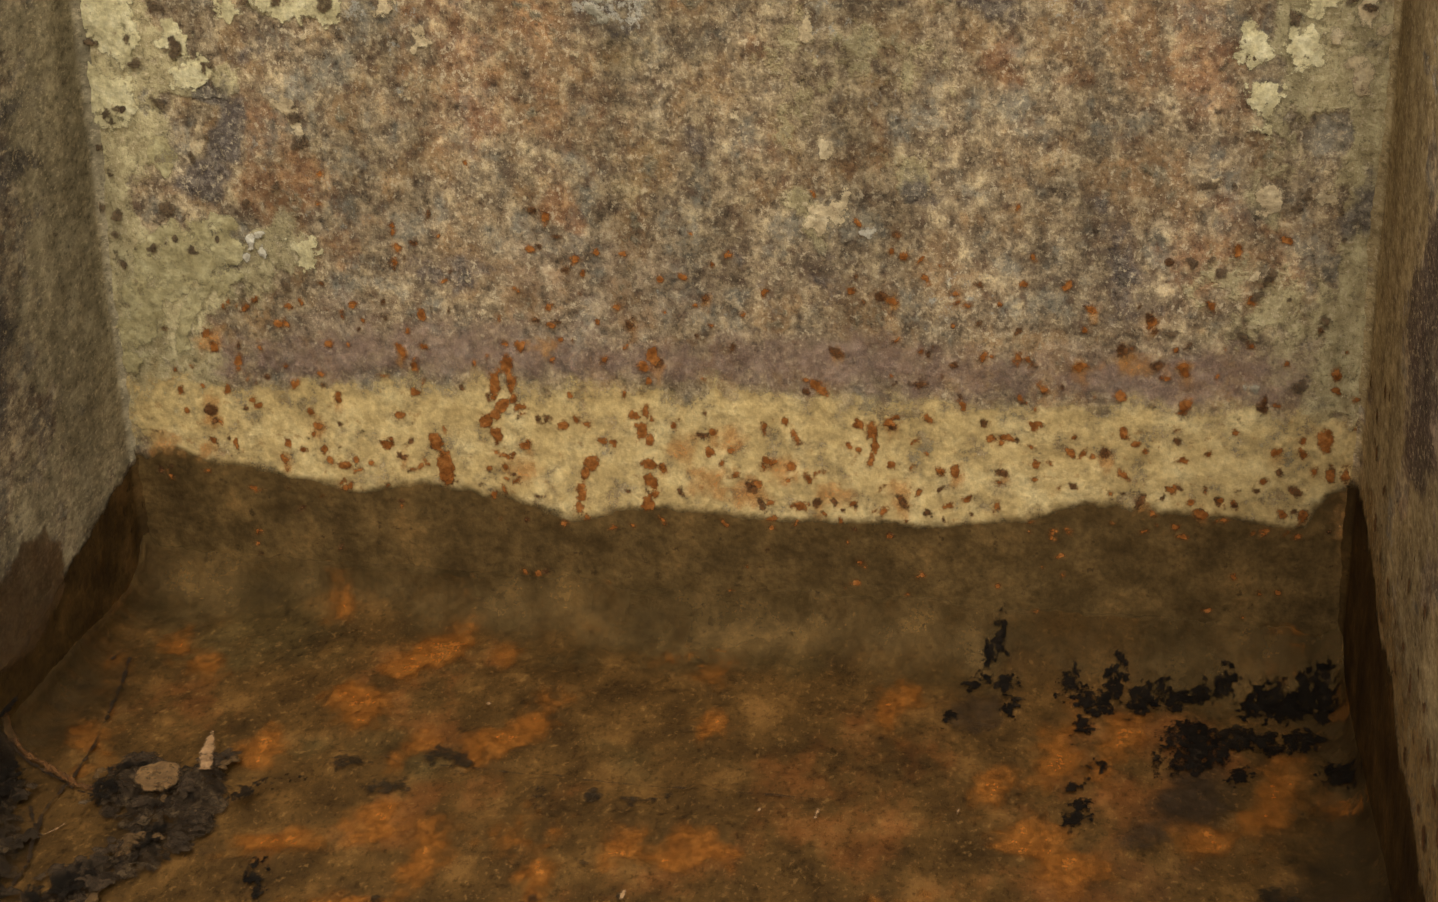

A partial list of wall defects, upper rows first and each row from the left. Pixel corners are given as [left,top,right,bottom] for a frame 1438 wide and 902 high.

peeling [80,0,220,151]
peeling [213,0,342,40]
peeling [269,86,309,150]
peeling [99,199,267,374]
peeling [281,235,324,292]
rust [280,407,458,491]
rust [472,340,617,527]
rust [622,347,667,526]
rust [695,411,974,544]
rust [1065,396,1350,540]
leakage [0,374,1438,902]
rust [19,731,307,902]